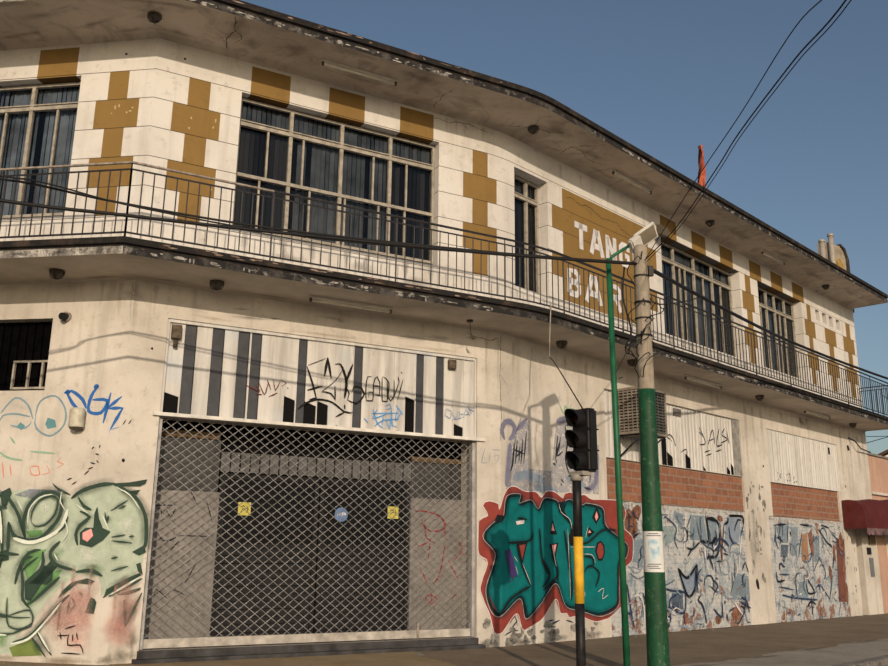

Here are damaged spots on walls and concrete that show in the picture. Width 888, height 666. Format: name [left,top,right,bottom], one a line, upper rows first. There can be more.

peeling [189,0,255,18]
peeling [304,25,379,53]
peeling [393,51,485,86]
peeling [206,250,262,273]
peeling [302,269,383,291]
peeling [395,285,493,311]